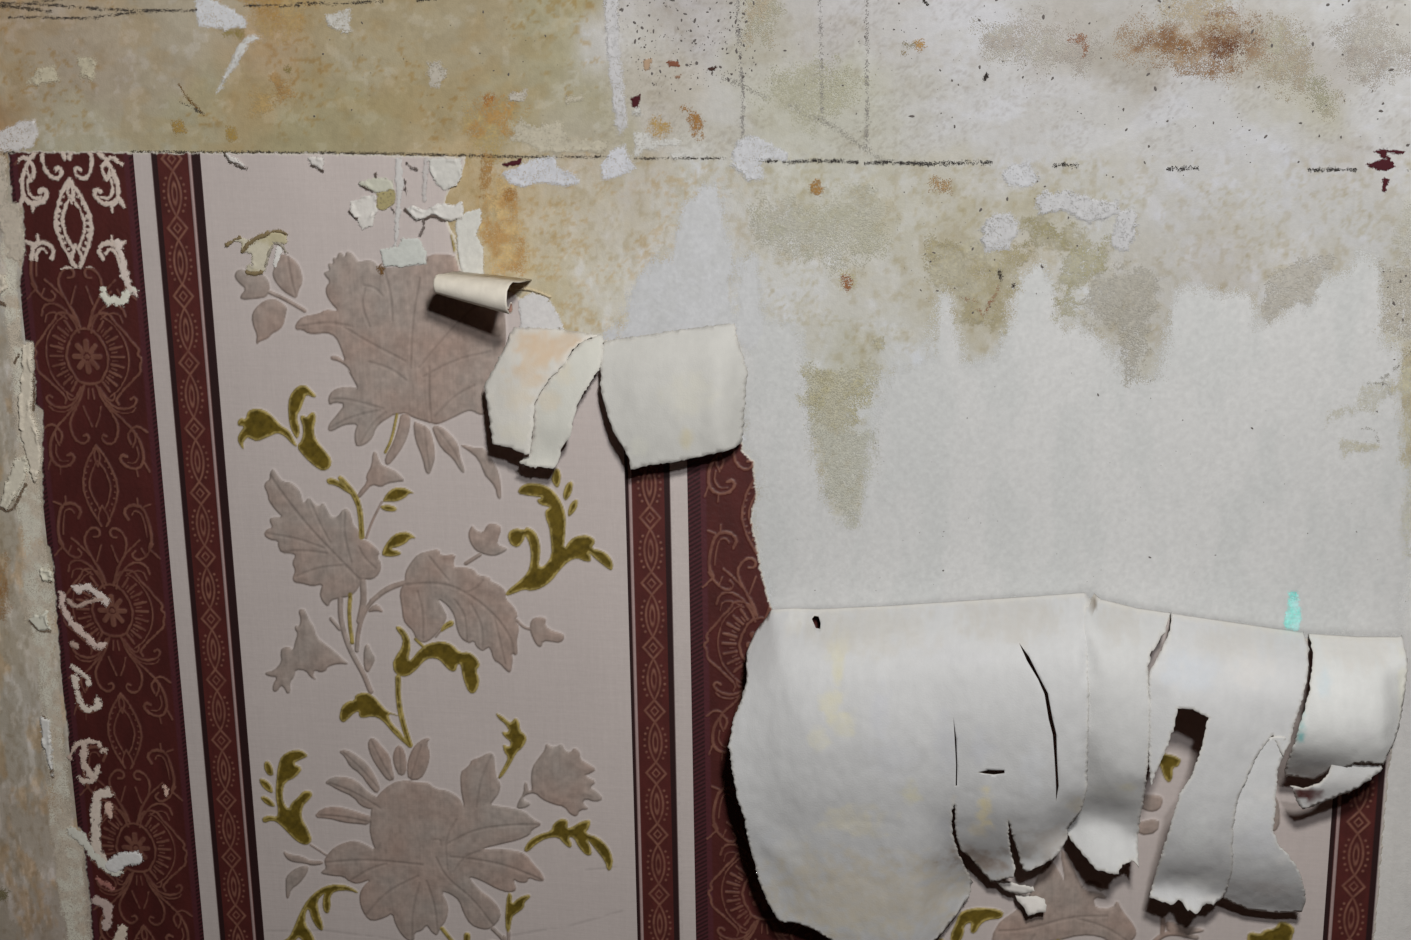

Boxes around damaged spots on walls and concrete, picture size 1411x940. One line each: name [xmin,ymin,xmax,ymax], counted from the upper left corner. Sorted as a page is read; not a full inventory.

rust [1110,0,1277,90]
peeling [0,342,44,513]
damp [795,336,886,530]
damp [1050,233,1165,390]
damp [1369,195,1411,558]
peeling [39,568,54,583]
peeling [40,715,55,779]